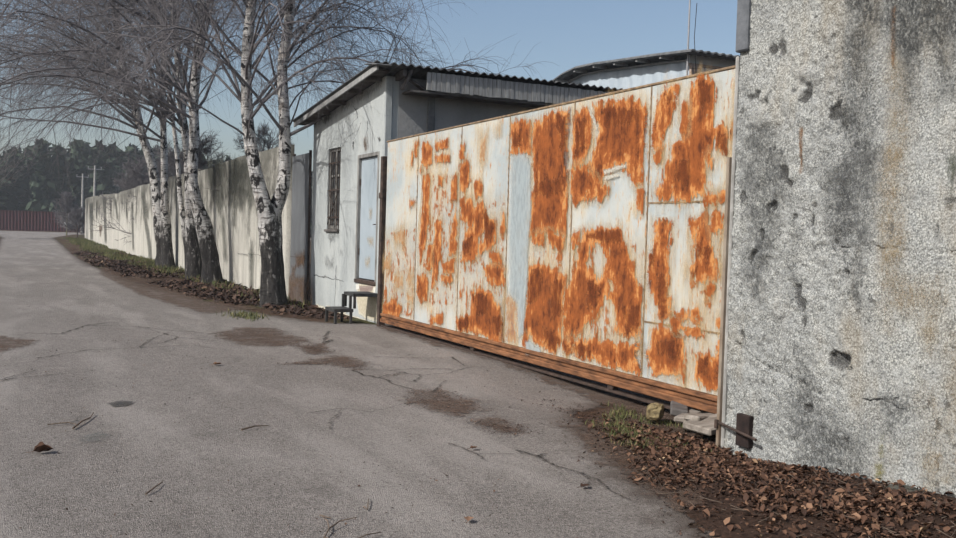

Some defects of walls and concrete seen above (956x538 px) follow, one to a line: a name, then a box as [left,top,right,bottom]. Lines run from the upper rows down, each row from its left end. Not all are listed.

spalling [770,39,786,55]
leakage [846,0,956,77]
spalling [792,82,812,103]
spalling [829,94,842,120]
leakage [89,196,152,259]
leakage [207,159,254,235]
rust [382,74,733,393]
leakage [824,153,875,234]
spalling [829,351,851,370]